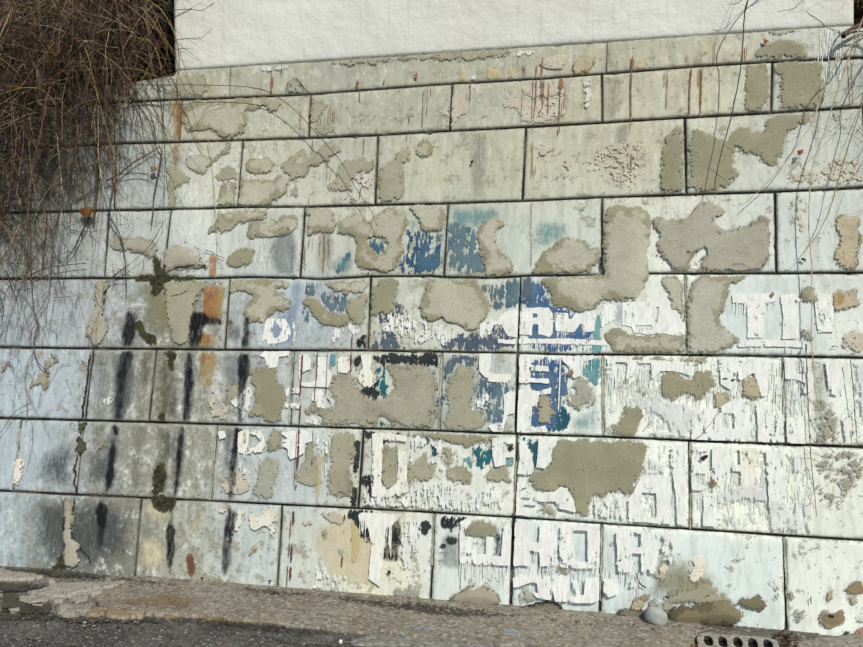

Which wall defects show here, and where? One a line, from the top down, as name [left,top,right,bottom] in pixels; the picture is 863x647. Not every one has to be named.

corrosion [521,58,565,133]
spalling [327,157,375,204]
spalling [295,362,499,497]
spalling [485,465,512,483]